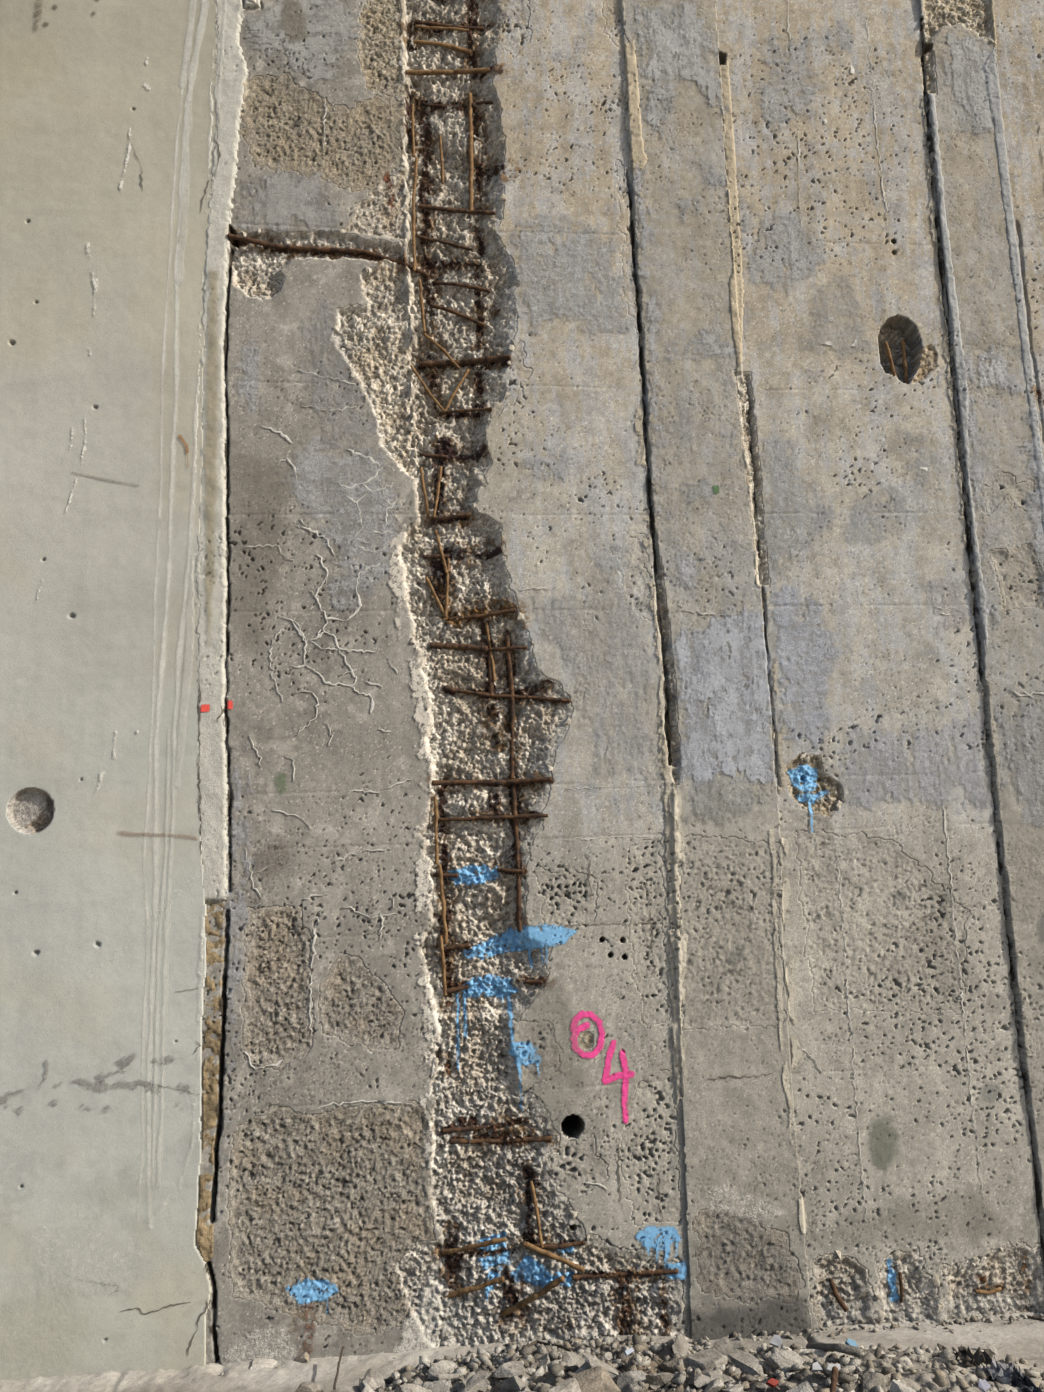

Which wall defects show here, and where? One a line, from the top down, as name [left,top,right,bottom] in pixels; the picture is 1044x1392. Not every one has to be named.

crack [200,115,221,212]
crack [627,182,657,574]
crack [152,248,398,1221]
crack [342,778,413,796]
spalling [220,0,1044,1348]
crack [568,404,778,789]
crack [920,17,1044,1260]
corrosion [430,1114,579,1329]
corrosion [574,1264,671,1337]